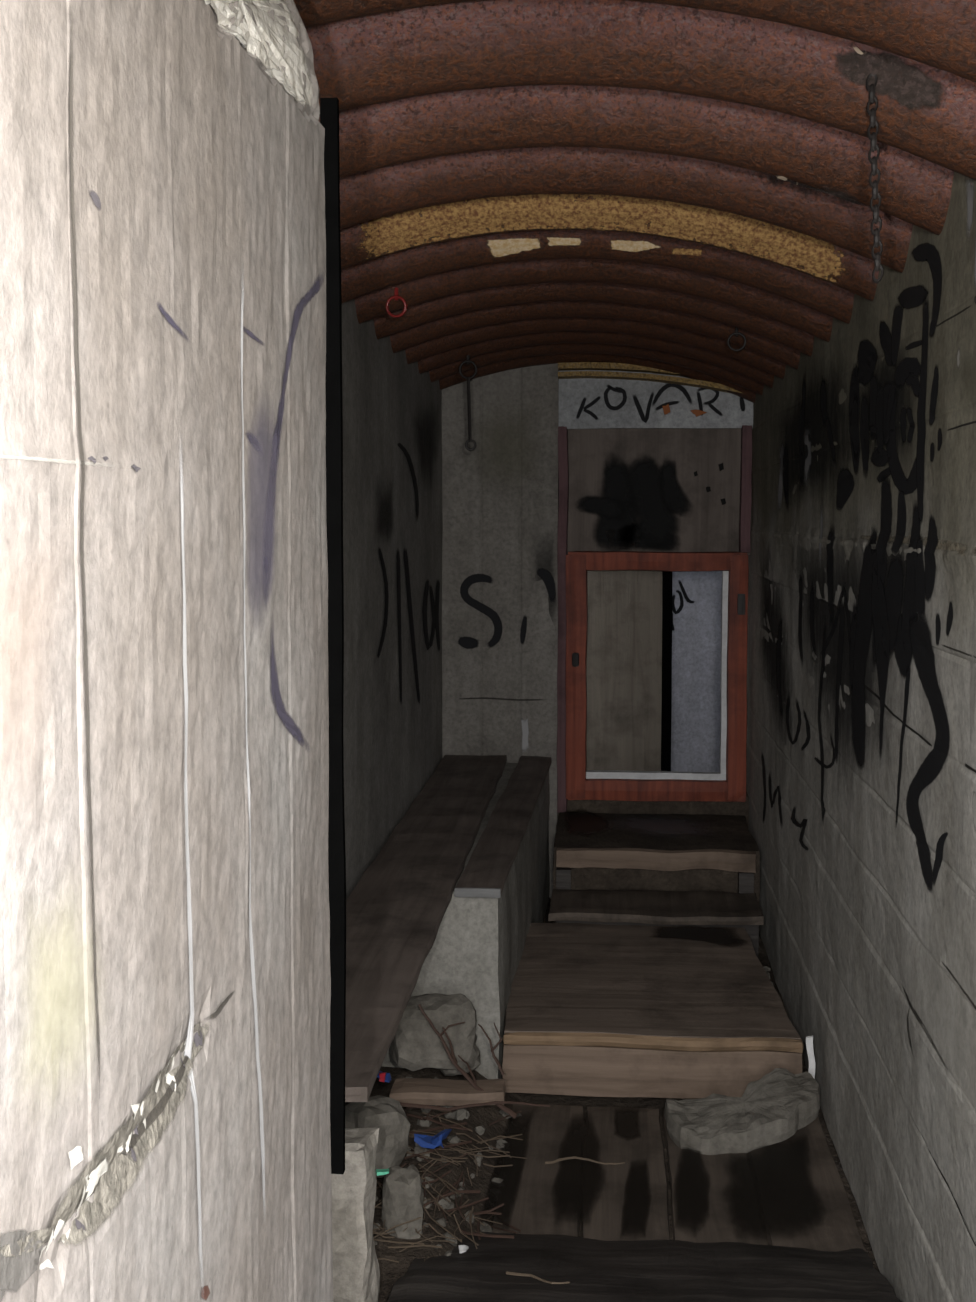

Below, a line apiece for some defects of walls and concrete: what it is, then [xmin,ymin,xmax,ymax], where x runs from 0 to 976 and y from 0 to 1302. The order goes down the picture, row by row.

spalling [204,0,313,107]
spalling [0,1230,42,1302]